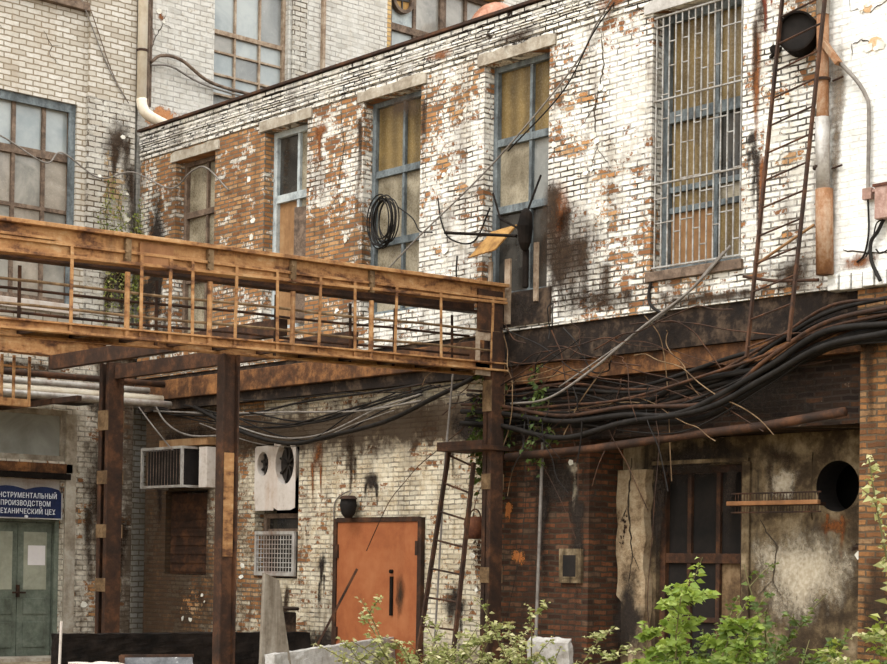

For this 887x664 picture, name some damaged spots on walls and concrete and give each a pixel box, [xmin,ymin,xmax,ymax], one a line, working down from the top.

peeling [562,83,607,111]
corrosion [747,0,772,225]
water stain [112,141,135,233]
peeling [437,145,451,180]
peeling [551,132,599,164]
peeling [583,167,625,184]
water stain [148,197,164,237]
peeling [317,181,349,260]
water stain [539,183,631,311]
water stain [143,276,168,332]
water stain [346,440,356,488]
water stain [758,538,851,614]